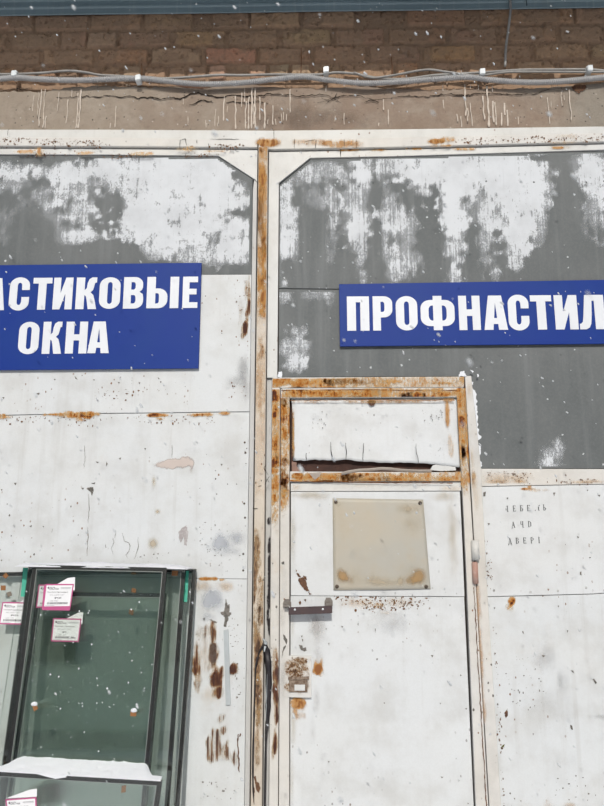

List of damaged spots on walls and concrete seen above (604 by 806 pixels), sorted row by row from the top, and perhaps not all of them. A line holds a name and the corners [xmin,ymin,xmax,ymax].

leakage [57,89,82,128]
leakage [215,87,291,129]
leakage [456,84,519,127]
peeling [0,158,250,264]
corrosion [235,138,279,318]
peeling [280,154,559,284]
peeling [573,153,604,228]
peeling [278,328,309,378]
corrosion [0,411,101,427]
corrosion [127,412,230,425]
corrosion [271,377,475,521]
corrosion [253,530,263,764]